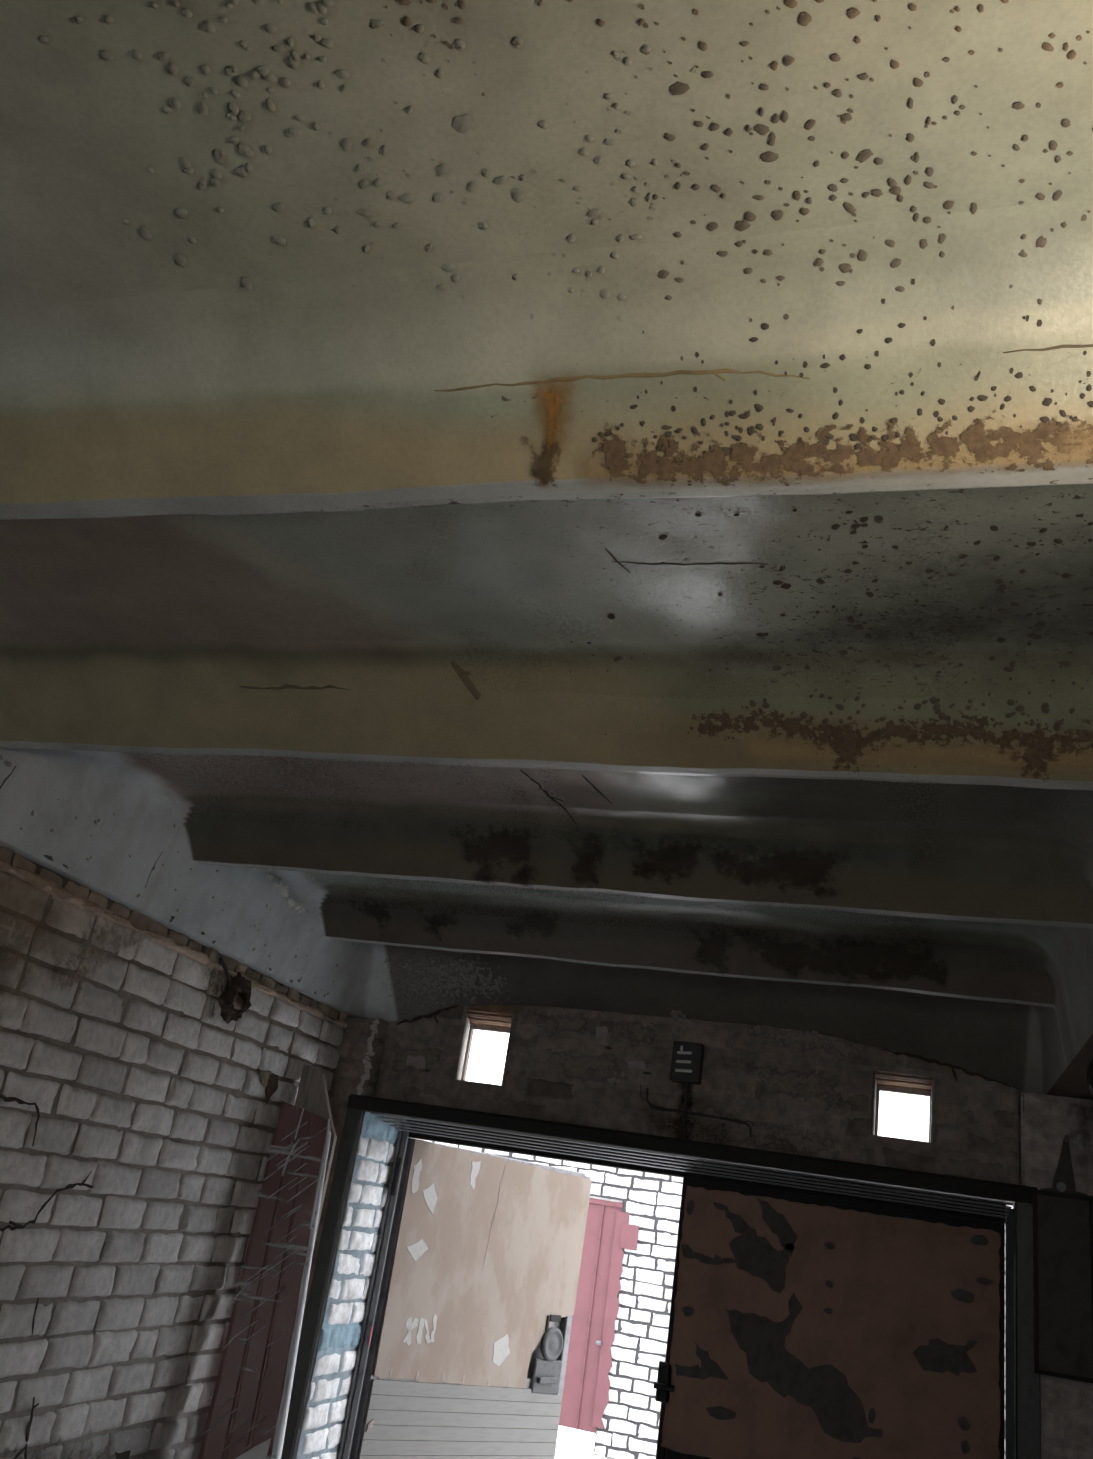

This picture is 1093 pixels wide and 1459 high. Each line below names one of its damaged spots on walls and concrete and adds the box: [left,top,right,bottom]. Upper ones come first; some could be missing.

peeling [740,0,824,63]
peeling [565,4,795,164]
peeling [814,73,874,124]
peeling [675,96,990,286]
peeling [865,323,906,370]
crack [1003,344,1093,353]
peeling [895,371,1022,435]
corrosion [524,387,568,501]
corrosion [592,411,1093,487]
crack [605,548,768,573]
corrosion [692,706,1093,780]
crack [0,1171,94,1232]